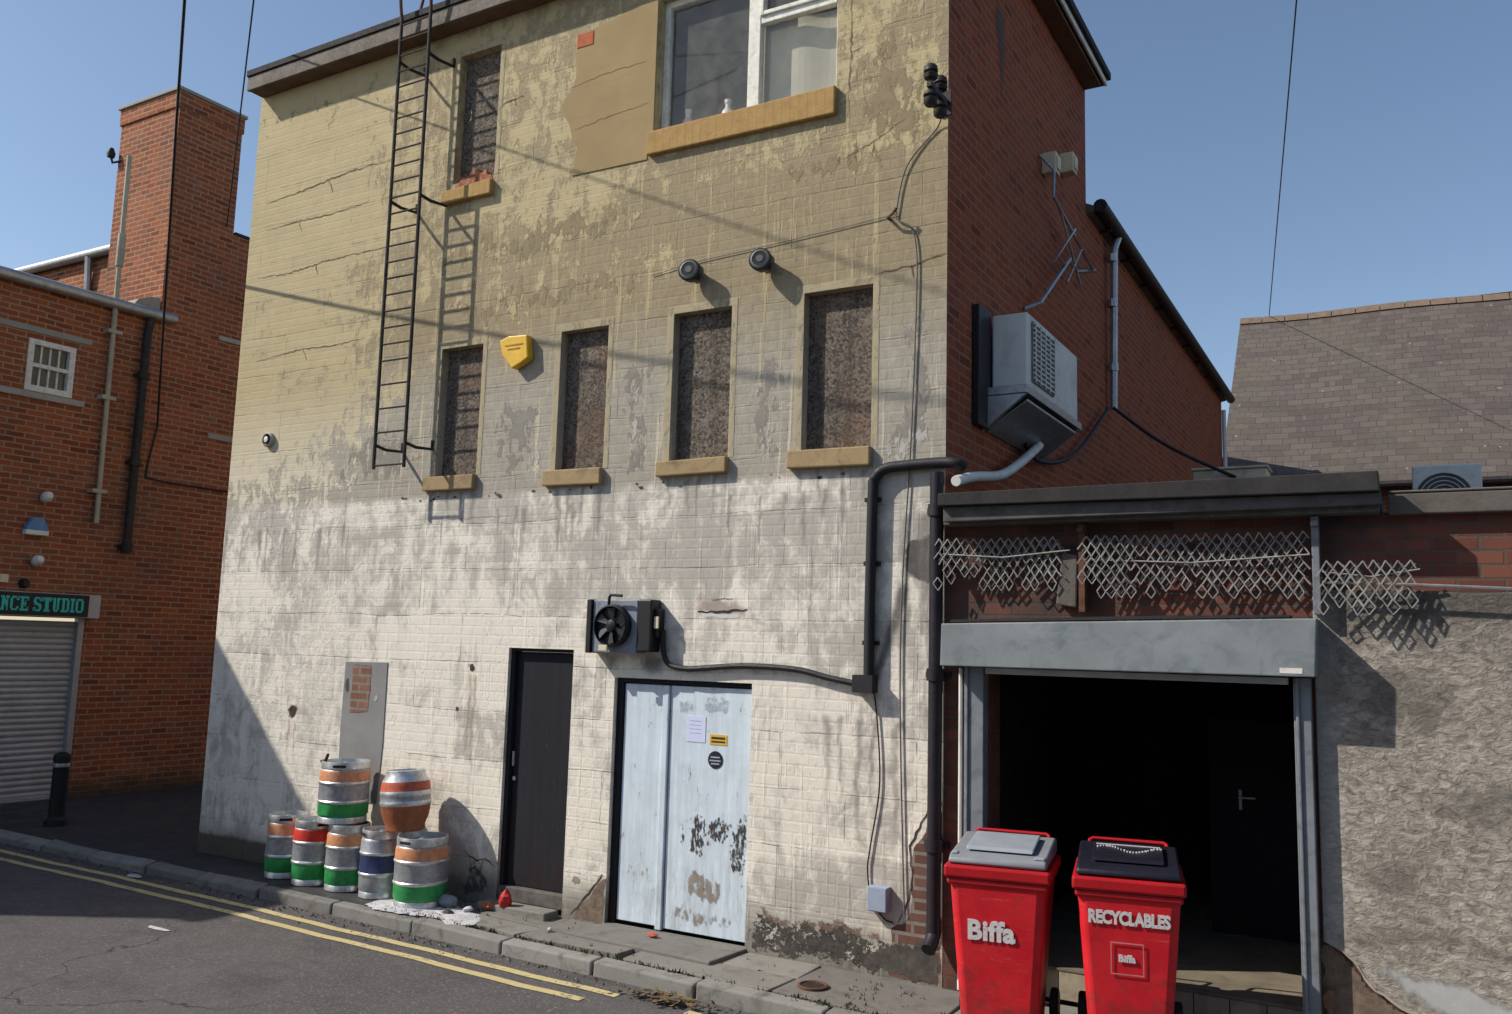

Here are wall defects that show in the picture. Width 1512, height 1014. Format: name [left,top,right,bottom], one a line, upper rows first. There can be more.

flaking render [577,30,594,49]
peeling [781,32,928,183]
peeling [439,204,652,327]
peeling [340,428,424,484]
peeling [494,401,543,473]
peeling [623,361,654,489]
peeling [746,354,790,478]
peeling [886,309,933,461]
leakage [876,587,906,676]
flaking render [1321,941,1419,1014]